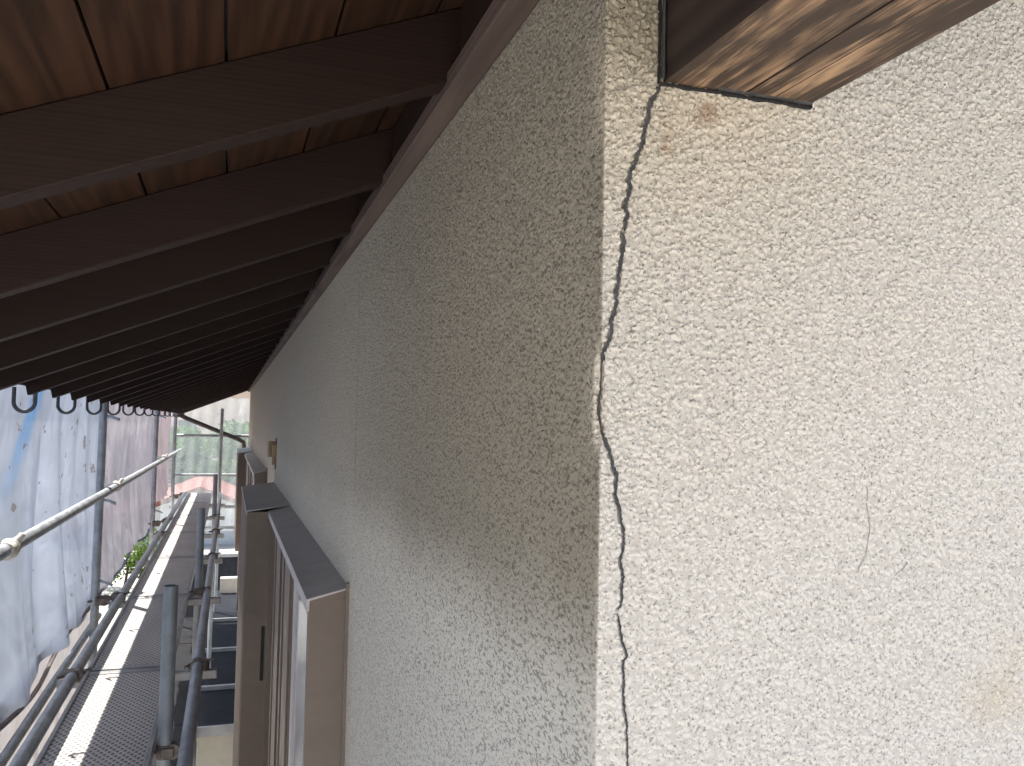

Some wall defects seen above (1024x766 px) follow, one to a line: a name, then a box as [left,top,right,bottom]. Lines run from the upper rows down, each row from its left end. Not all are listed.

crack [597,83,661,766]